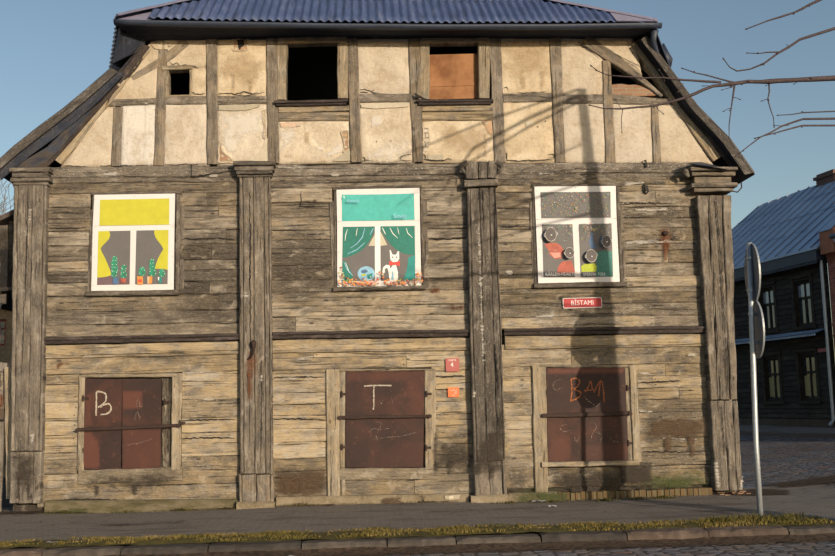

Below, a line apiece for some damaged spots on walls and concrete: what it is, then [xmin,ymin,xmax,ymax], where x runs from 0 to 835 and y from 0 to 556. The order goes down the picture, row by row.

crack [192,89,262,97]
spalling [218,141,234,164]
spalling [340,130,350,153]
spalling [422,126,431,155]